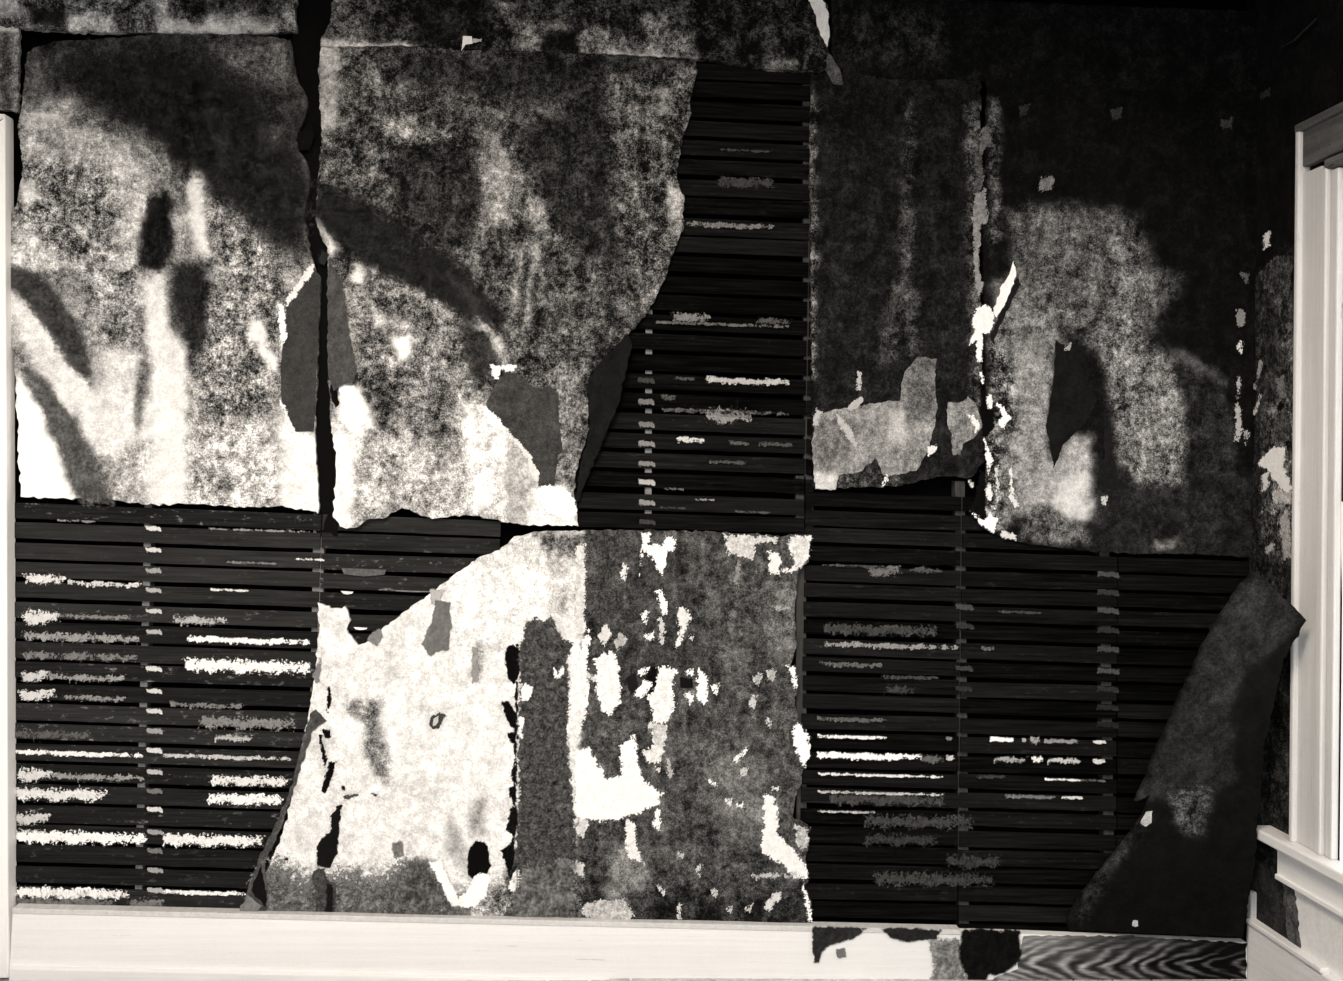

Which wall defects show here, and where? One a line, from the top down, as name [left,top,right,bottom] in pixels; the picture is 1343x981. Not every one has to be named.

peeling [808,0,843,85]
flaking render [15,503,501,912]
crack [292,0,339,536]
flaking render [484,63,1250,981]
peeling [1234,360,1292,561]
peeling [1239,231,1294,293]